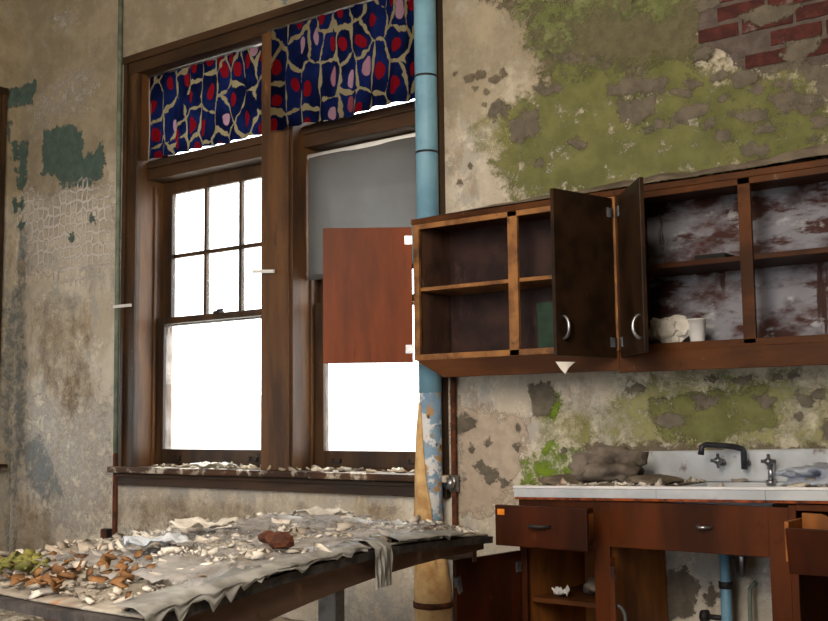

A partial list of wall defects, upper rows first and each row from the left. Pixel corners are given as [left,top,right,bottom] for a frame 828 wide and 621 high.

peeling [7,120,29,229]
peeling [7,79,37,110]
peeling [40,124,107,190]
flaking render [453,68,541,145]
flaking render [519,0,828,164]
flaking render [448,380,557,520]